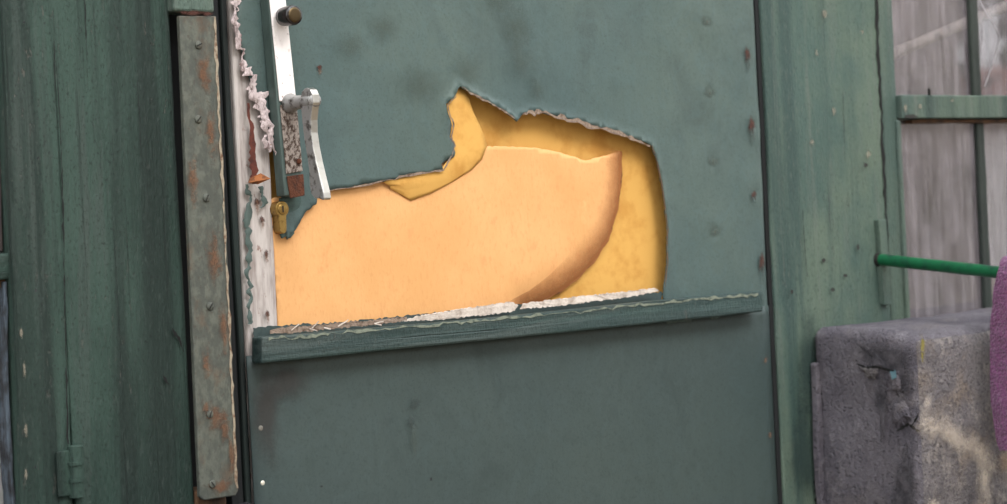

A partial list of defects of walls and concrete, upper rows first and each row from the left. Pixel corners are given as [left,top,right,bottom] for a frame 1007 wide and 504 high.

peeling [230,0,277,156]
crack [876,0,889,243]